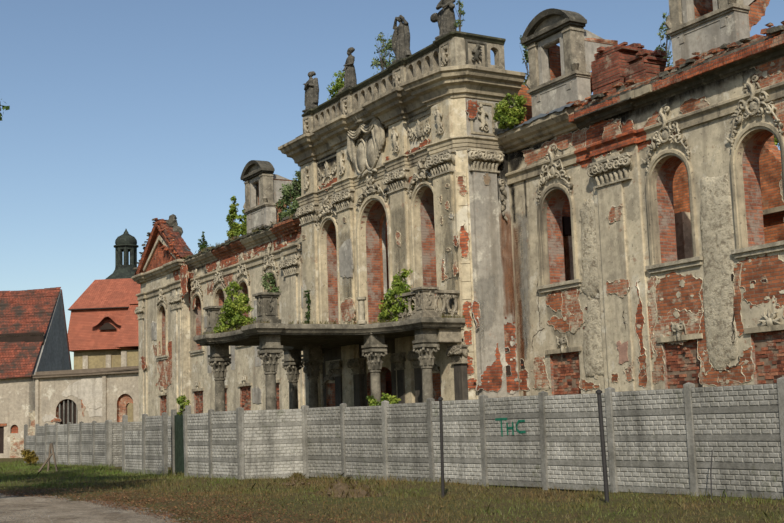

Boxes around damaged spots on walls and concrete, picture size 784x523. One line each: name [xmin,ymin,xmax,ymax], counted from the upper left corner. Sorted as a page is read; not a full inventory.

spalling [743,56,784,92]
spalling [465,99,480,120]
spalling [522,109,660,169]
spalling [439,175,468,225]
spalling [608,205,623,224]
spalling [441,223,470,282]
spalling [141,340,172,391]
spalling [173,262,196,311]
spalling [462,300,551,394]
spalling [545,287,587,334]
spalling [605,271,755,388]
spalling [730,253,784,337]